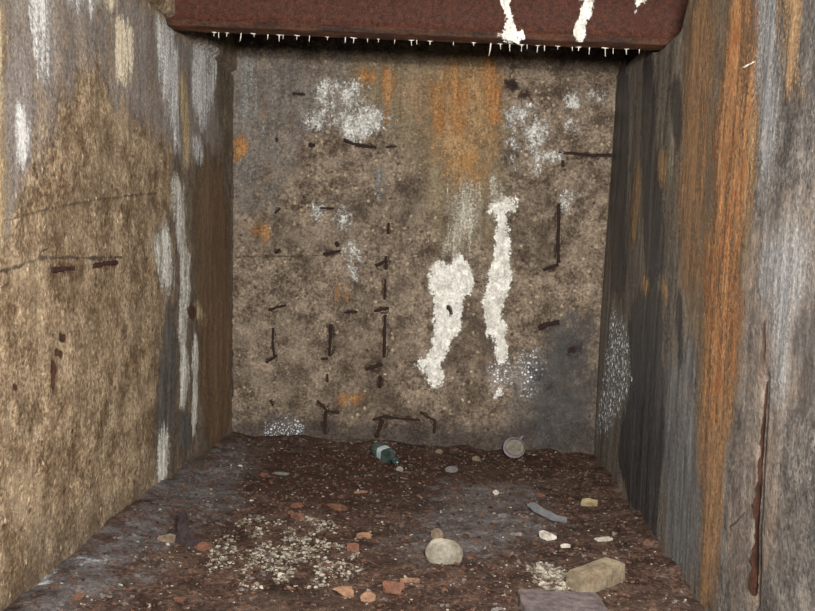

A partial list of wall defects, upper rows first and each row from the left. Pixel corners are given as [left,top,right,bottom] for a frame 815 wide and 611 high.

efflorescence [498,0,525,44]
efflorescence [573,0,594,42]
efflorescence [304,77,391,143]
corrosion [356,52,505,202]
crack [1,247,123,288]
damp [414,52,700,583]
corrosion [678,0,760,606]
crack [730,320,769,596]